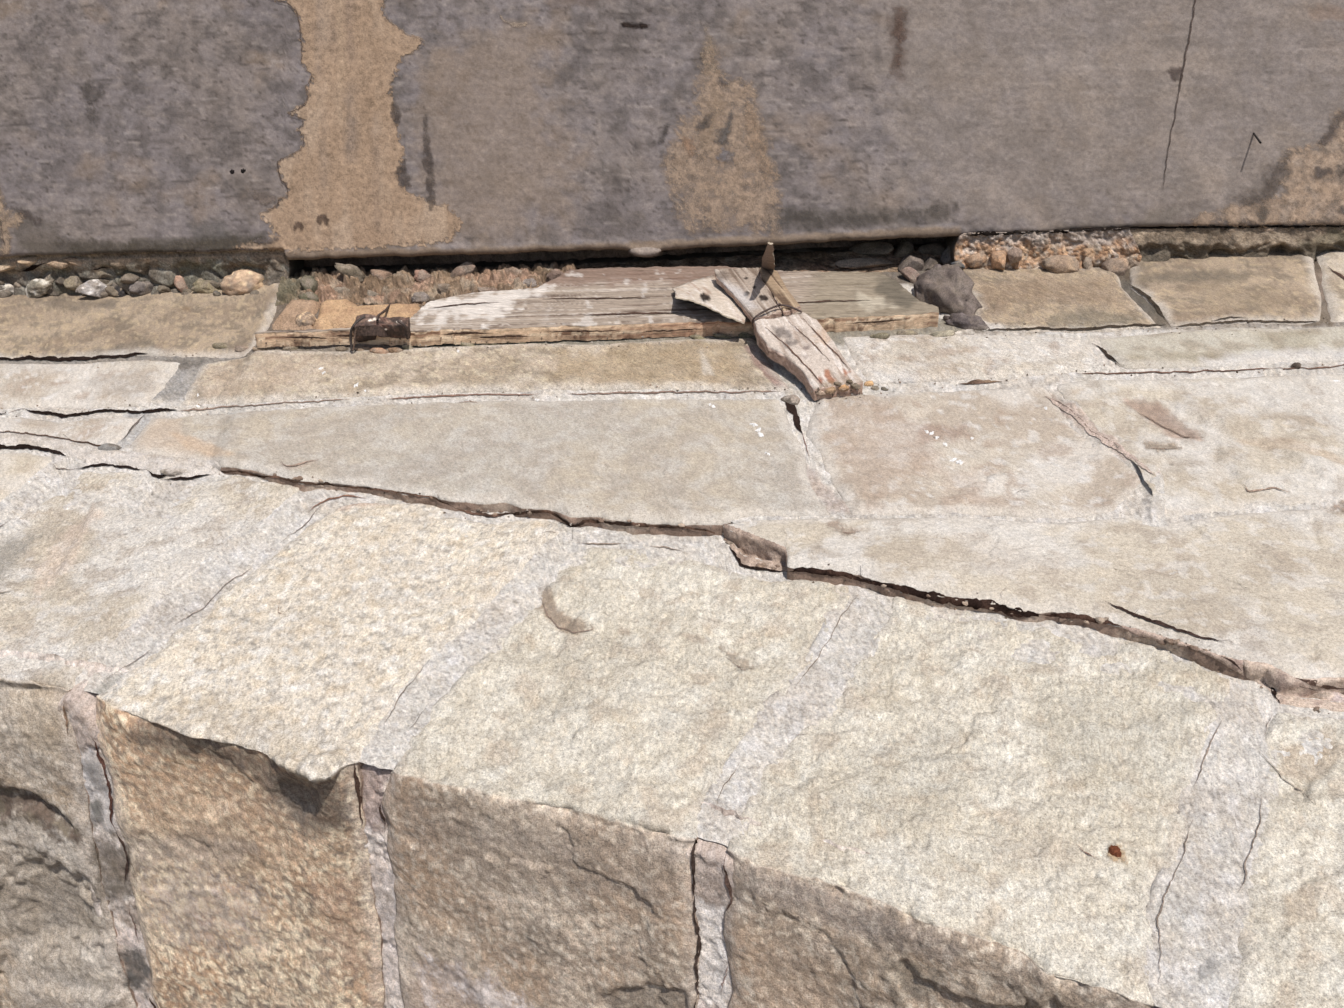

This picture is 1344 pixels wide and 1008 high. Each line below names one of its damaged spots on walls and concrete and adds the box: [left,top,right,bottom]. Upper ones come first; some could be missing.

peeling [235,0,463,254]
crack [1163,0,1196,186]
crack [0,352,148,361]
crack [0,399,349,470]
crack [221,459,715,553]
crack [1245,485,1292,493]
crack [109,565,254,677]
crack [786,567,1233,687]